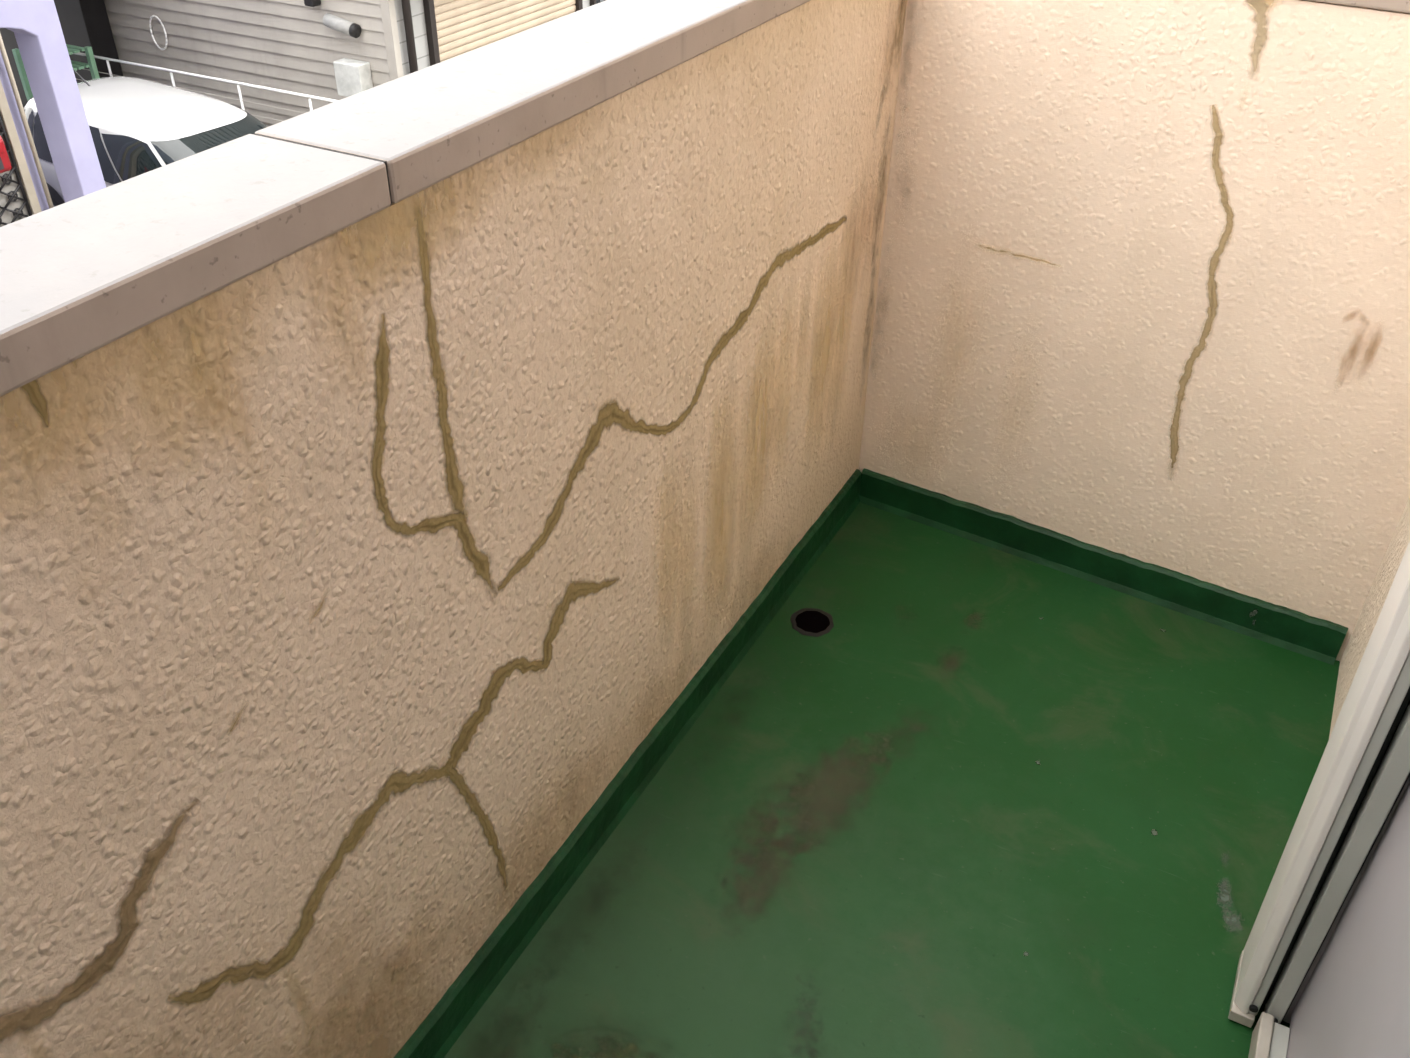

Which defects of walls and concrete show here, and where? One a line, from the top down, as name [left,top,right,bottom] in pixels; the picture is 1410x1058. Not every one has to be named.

crack [372,205,847,594]
crack [1170,105,1234,468]
crack [0,799,198,1043]
crack [168,579,619,1006]